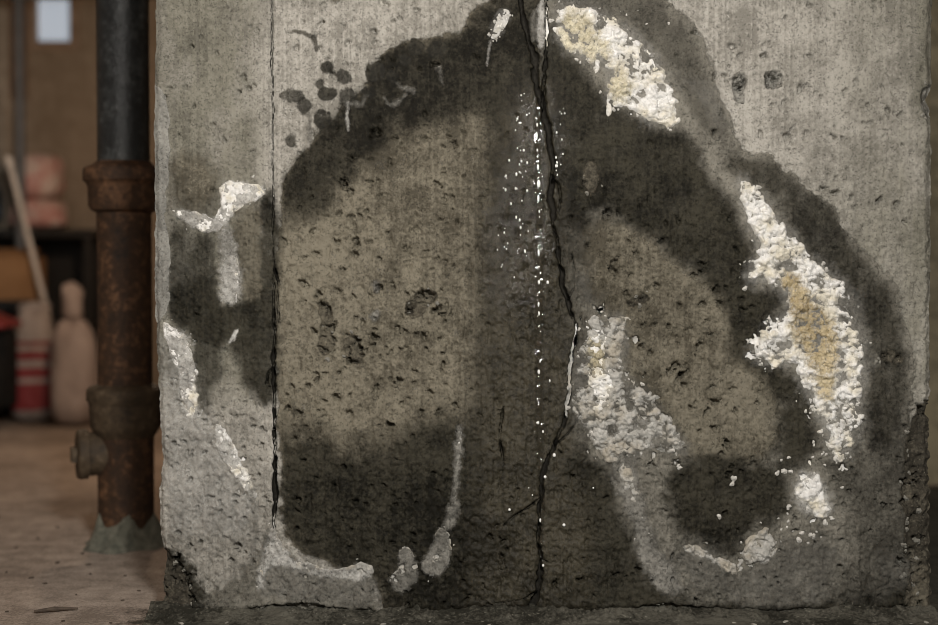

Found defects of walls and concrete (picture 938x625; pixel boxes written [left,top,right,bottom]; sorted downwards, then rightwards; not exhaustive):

damp [163,0,915,611]
crack [503,0,579,606]
damp [927,486,938,613]